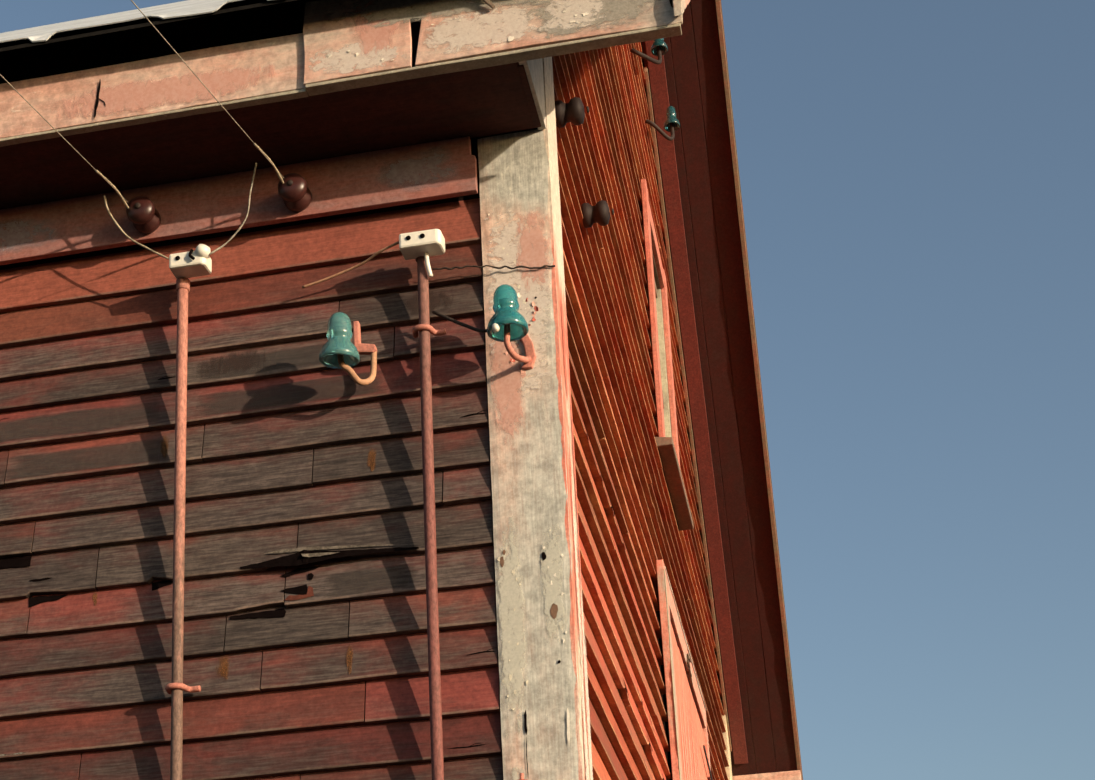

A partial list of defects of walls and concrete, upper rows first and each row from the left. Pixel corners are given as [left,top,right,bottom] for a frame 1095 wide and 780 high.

peeling [485,211,593,780]